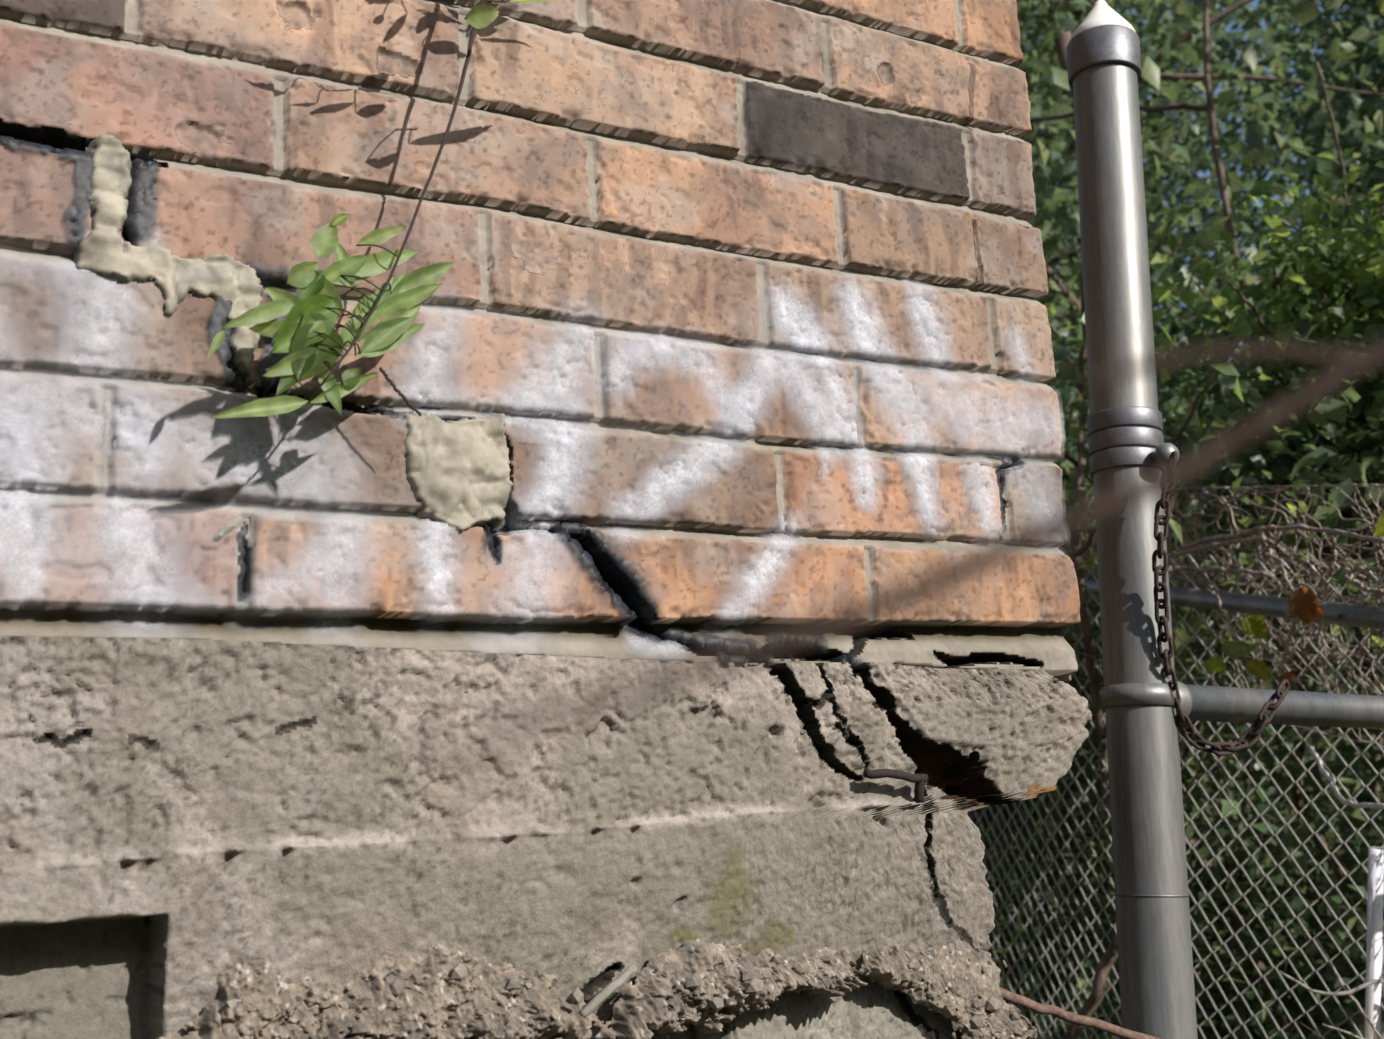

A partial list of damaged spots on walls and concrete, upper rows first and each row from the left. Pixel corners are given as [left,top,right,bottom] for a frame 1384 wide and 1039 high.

crack [0,118,94,154]
crack [130,155,169,169]
crack [120,229,140,247]
crack [256,387,475,422]
crack [482,433,590,566]
crack [597,580,710,656]
crack [769,626,1044,781]
crack [919,783,980,952]
spalling [158,937,1038,1039]
crack [580,962,625,1000]
crack [892,989,940,1039]